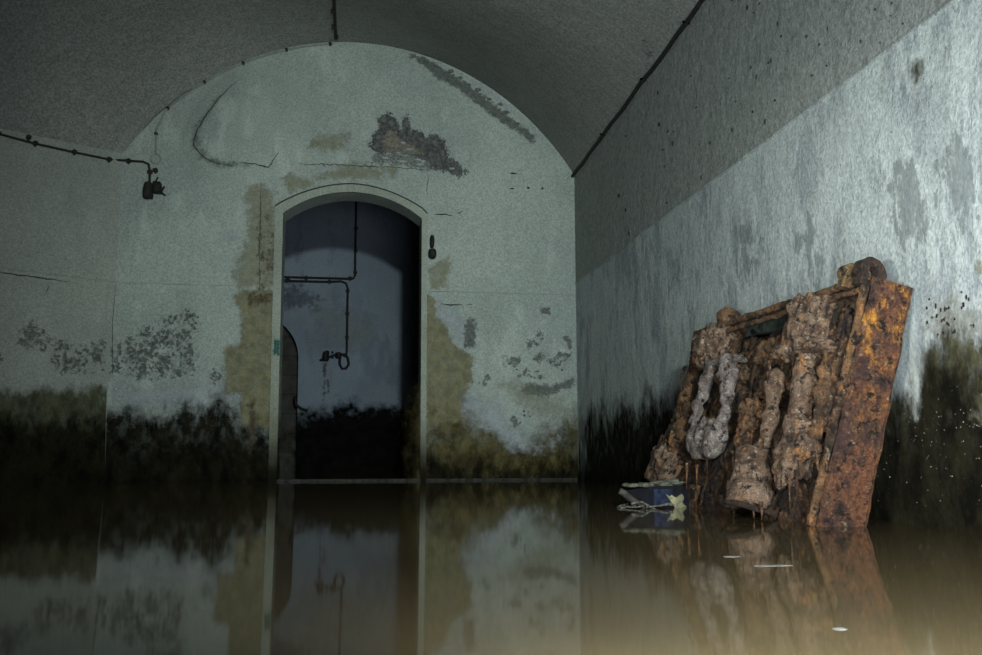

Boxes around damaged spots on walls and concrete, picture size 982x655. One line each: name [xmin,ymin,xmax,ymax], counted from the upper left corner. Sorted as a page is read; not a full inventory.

spalling [368,112,469,178]
peeling [18,309,199,381]
water stain [124,185,319,428]
water stain [426,260,525,450]
peeling [507,308,575,396]
water stain [910,335,920,401]